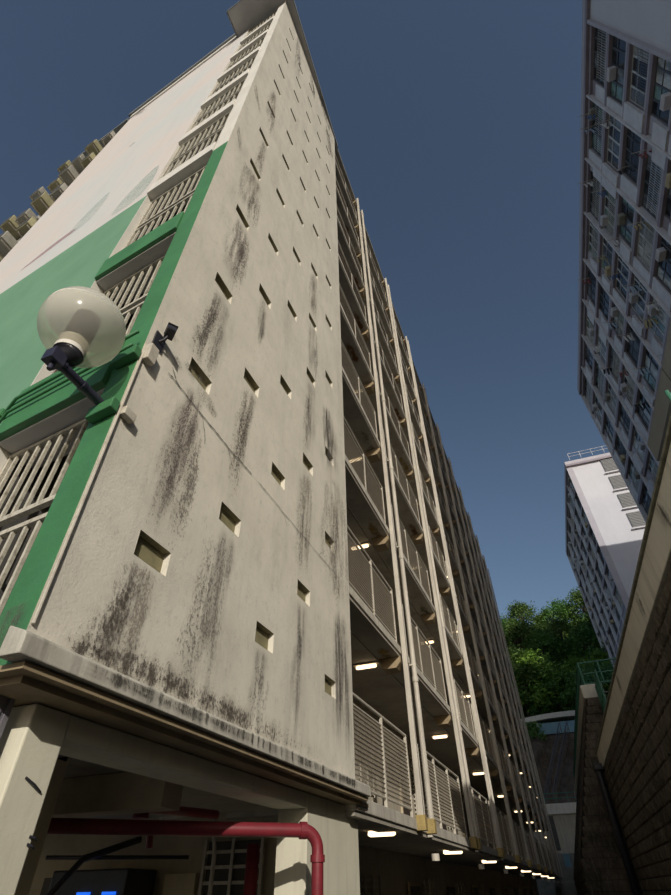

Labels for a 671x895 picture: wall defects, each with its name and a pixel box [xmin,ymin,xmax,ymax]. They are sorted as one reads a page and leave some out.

leakage [161,393,199,498]
leakage [95,570,271,749]
leakage [282,751,355,787]